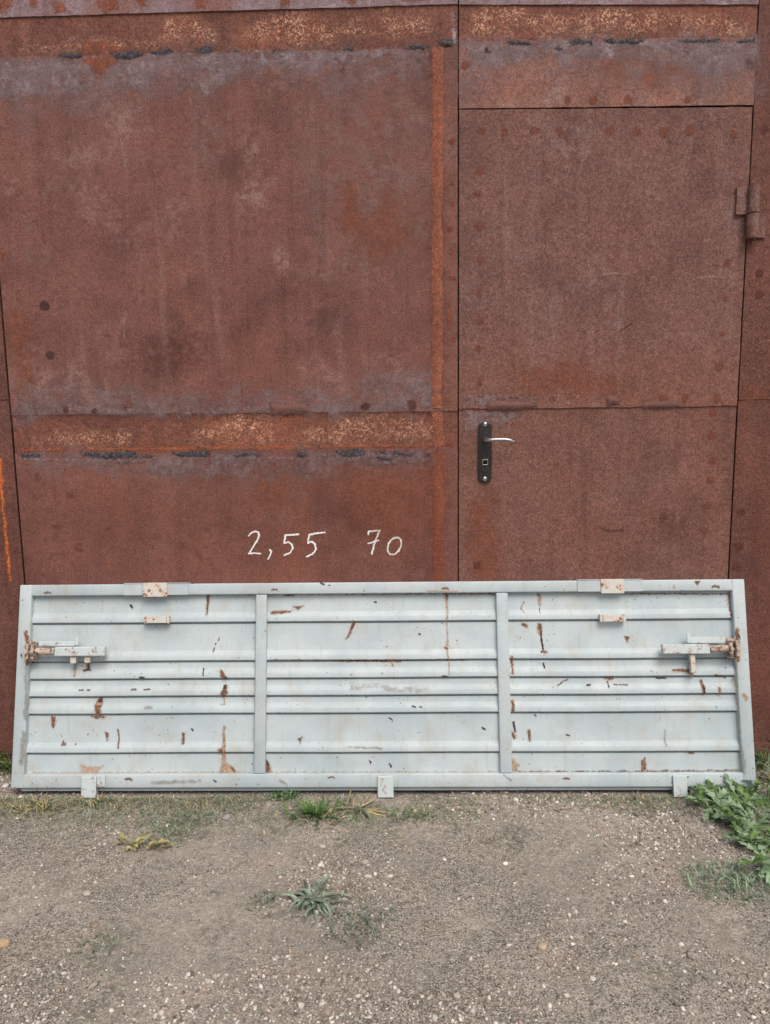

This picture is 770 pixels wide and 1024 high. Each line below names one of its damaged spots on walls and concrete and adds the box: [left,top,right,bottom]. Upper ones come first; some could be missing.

rust [27,19,215,74]
rust [245,0,371,48]
rust [472,5,750,40]
rust [24,399,432,452]